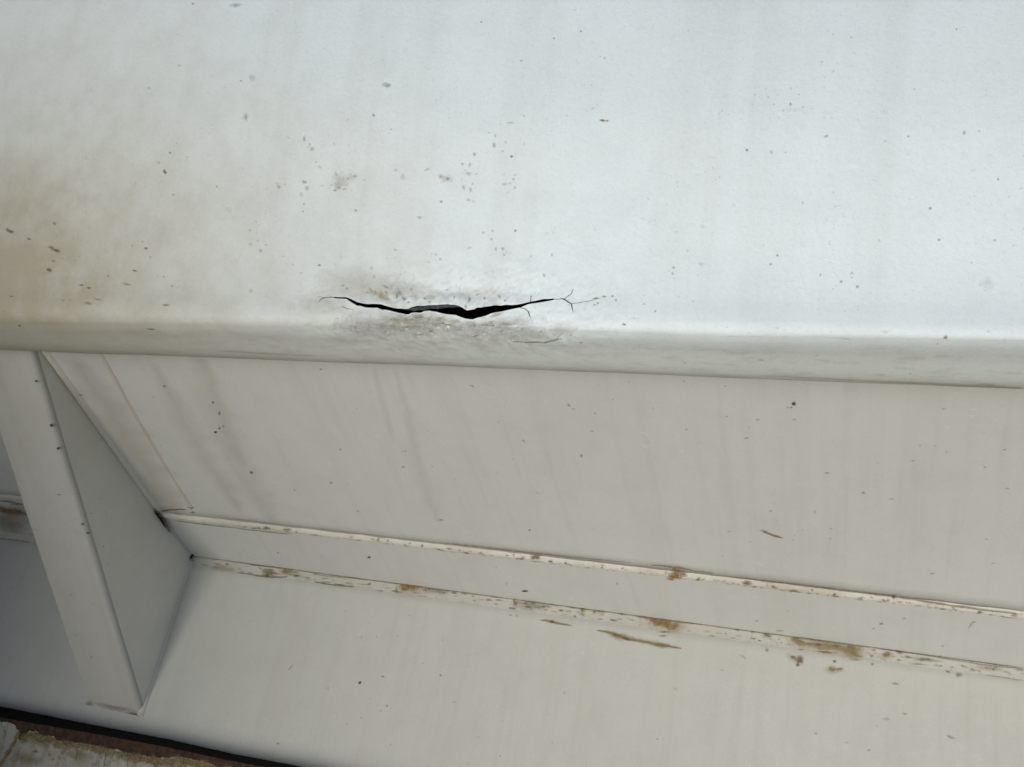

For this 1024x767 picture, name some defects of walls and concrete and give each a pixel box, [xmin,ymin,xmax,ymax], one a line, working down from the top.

crack [317,290,601,319]